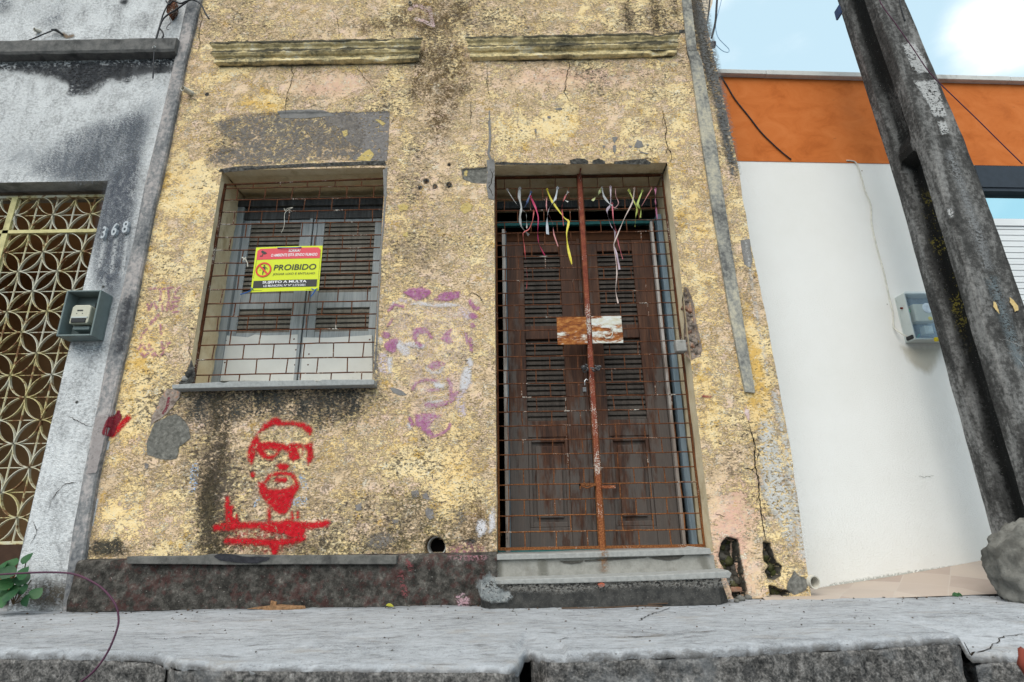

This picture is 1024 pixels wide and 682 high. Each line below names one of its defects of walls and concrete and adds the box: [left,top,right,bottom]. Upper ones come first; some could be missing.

damp [0,58,175,95]
damp [357,0,474,151]
flaking render [208,109,390,384]
spalling [673,287,702,360]
damp [179,388,372,554]
crack [744,420,766,539]
damp [325,493,453,552]
spalling [718,537,747,598]
spalling [762,542,791,596]